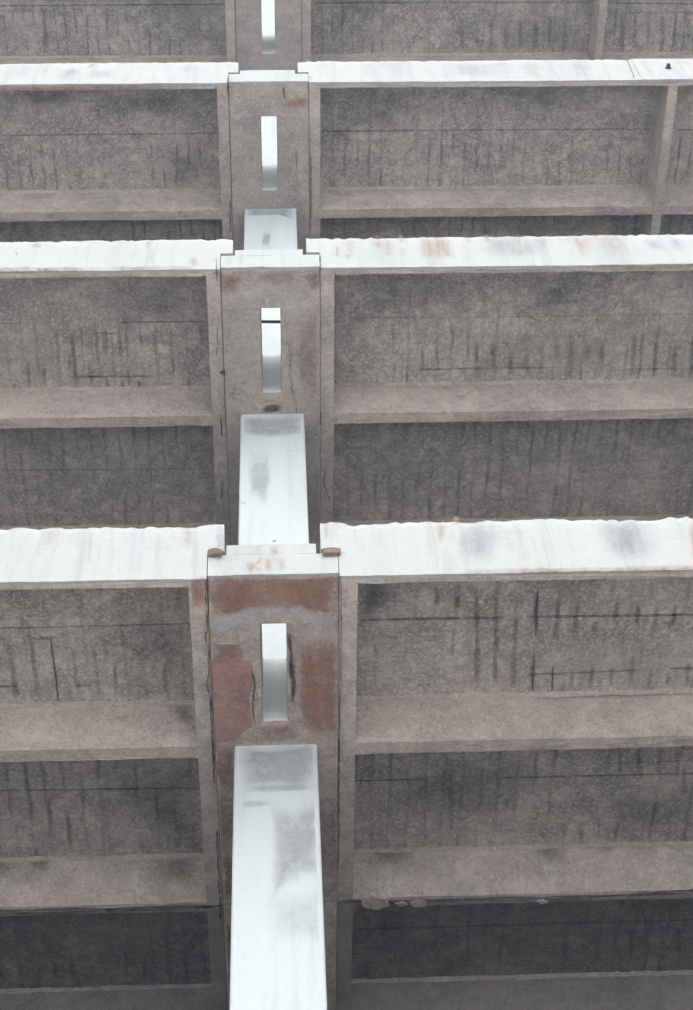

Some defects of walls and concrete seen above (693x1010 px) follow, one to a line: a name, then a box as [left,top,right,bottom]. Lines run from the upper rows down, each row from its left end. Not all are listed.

rust [221,540,331,612]